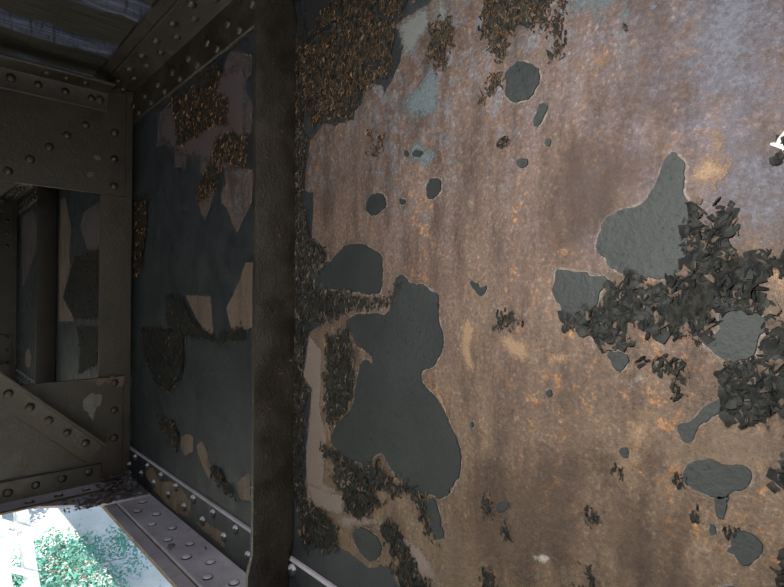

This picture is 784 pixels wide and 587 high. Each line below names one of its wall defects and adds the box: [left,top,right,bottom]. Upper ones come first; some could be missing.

corrosion [161,59,247,171]
peeling [169,50,253,233]
corrosion [691,161,728,188]
peeling [59,197,124,420]
peeling [186,295,213,334]
peeling [226,262,253,332]
corrosion [461,318,475,372]
corrosion [501,335,530,362]
peeling [292,0,784,587]
corrosion [767,269,784,293]
peeling [180,433,251,502]
corrosion [617,411,647,469]